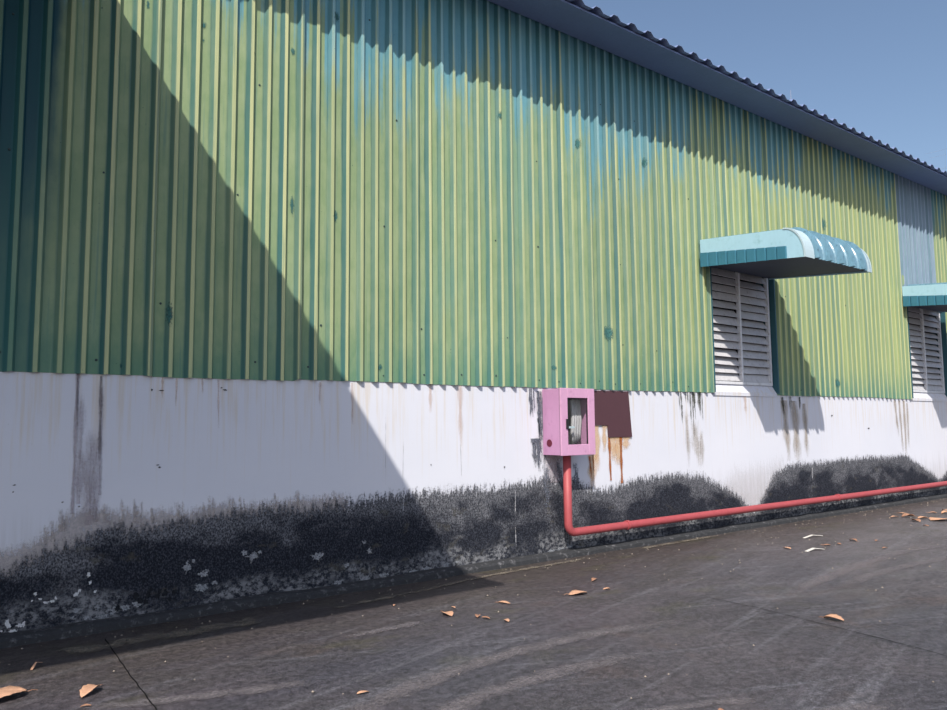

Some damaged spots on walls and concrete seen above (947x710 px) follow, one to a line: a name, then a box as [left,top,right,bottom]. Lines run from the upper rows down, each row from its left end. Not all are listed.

rust [589,425,629,483]
damp [0,374,947,633]
damp [355,624,653,710]